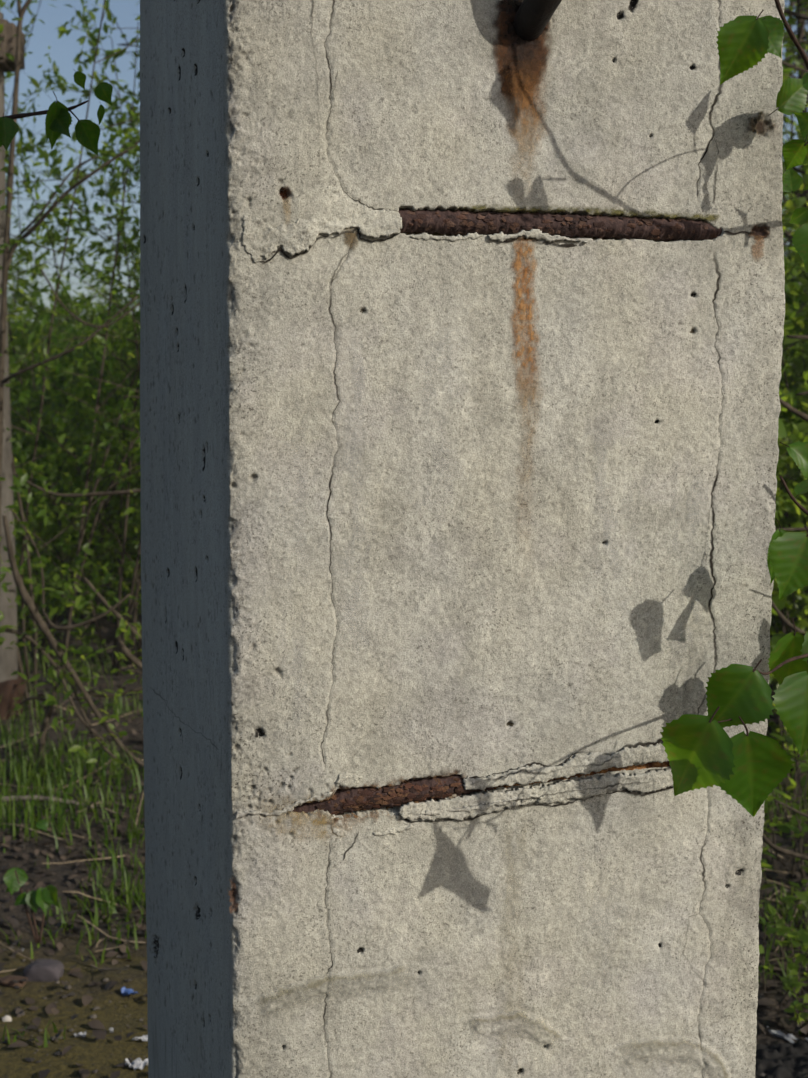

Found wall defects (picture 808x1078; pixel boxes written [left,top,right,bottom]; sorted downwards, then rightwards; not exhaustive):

crack [312,0,335,126]
corrosion [494,0,550,145]
crack [697,61,722,201]
spalling [242,186,722,263]
crack [329,271,341,424]
corrosion [514,243,539,376]
crack [713,264,724,408]
crack [326,469,334,586]
crack [708,471,719,673]
corrosion [293,785,358,834]
corrosion [371,770,465,789]
peeling [236,743,673,837]